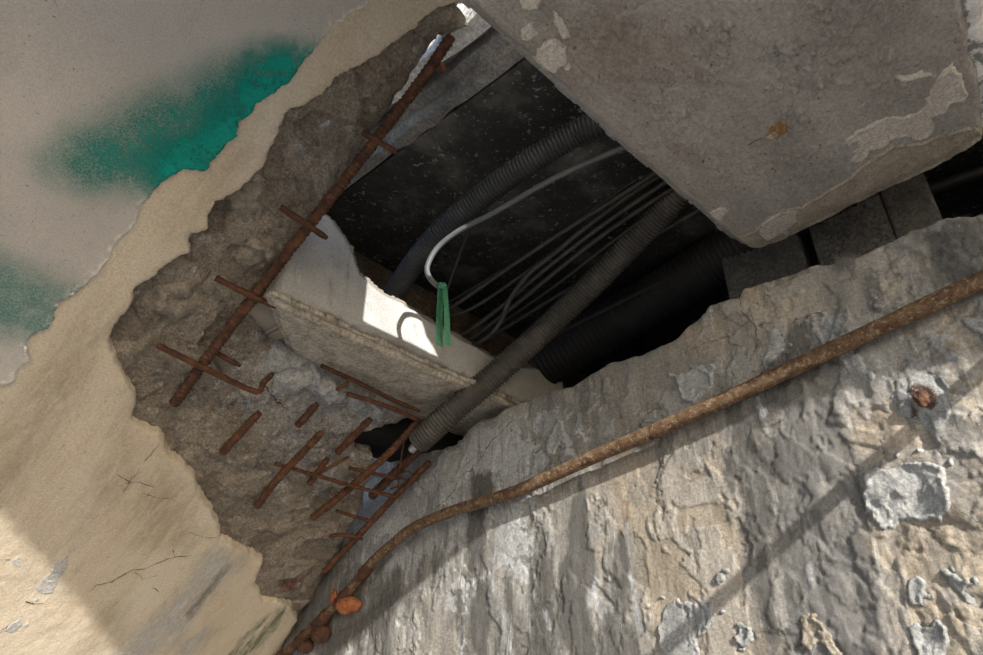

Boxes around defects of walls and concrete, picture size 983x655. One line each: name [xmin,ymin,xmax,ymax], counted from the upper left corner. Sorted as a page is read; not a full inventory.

peeling [519,0,572,73]
peeling [707,62,983,248]
spalling [153,33,467,574]
rust [890,372,955,430]
crack [118,445,175,501]
peeling [863,448,954,531]
flaking render [35,548,74,602]
crack [92,532,215,592]
rust [276,562,373,655]
damp [456,473,506,654]
damp [501,577,514,655]
damp [531,482,643,655]